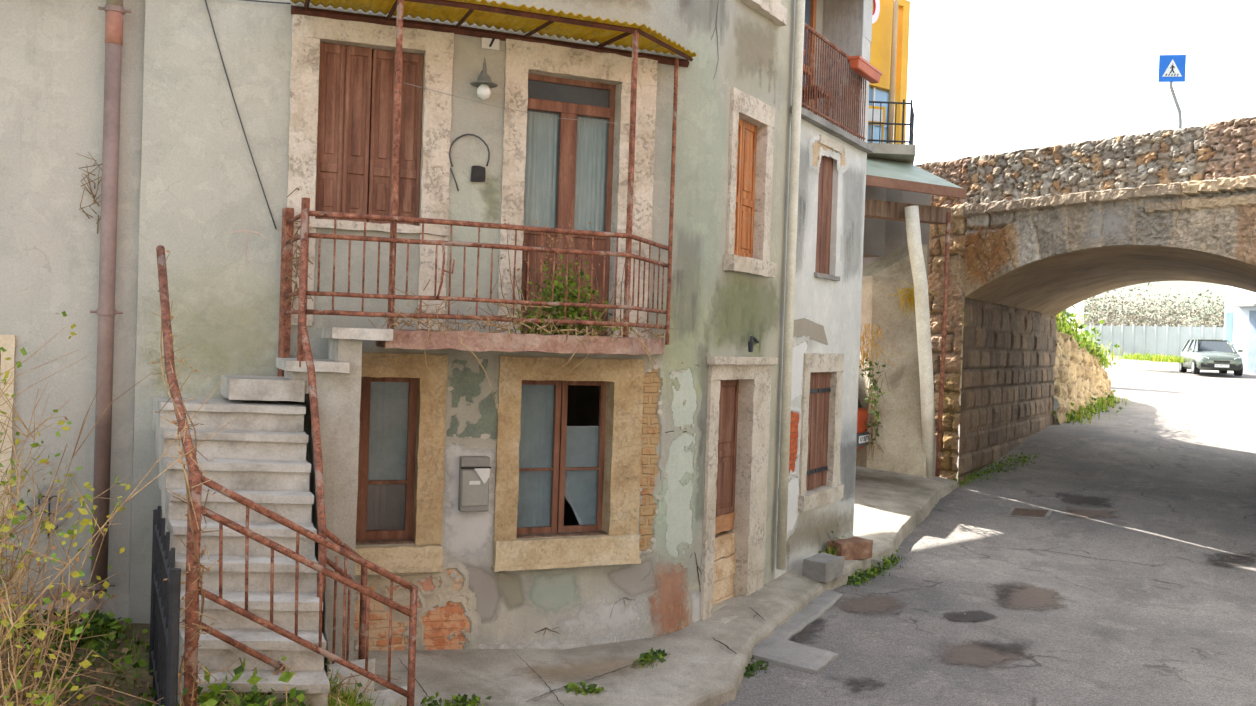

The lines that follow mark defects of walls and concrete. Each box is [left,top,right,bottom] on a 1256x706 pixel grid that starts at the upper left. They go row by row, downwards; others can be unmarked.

peeling [445,350,506,448]
peeling [638,359,702,568]
peeling [778,336,810,542]
flaking render [353,555,481,651]